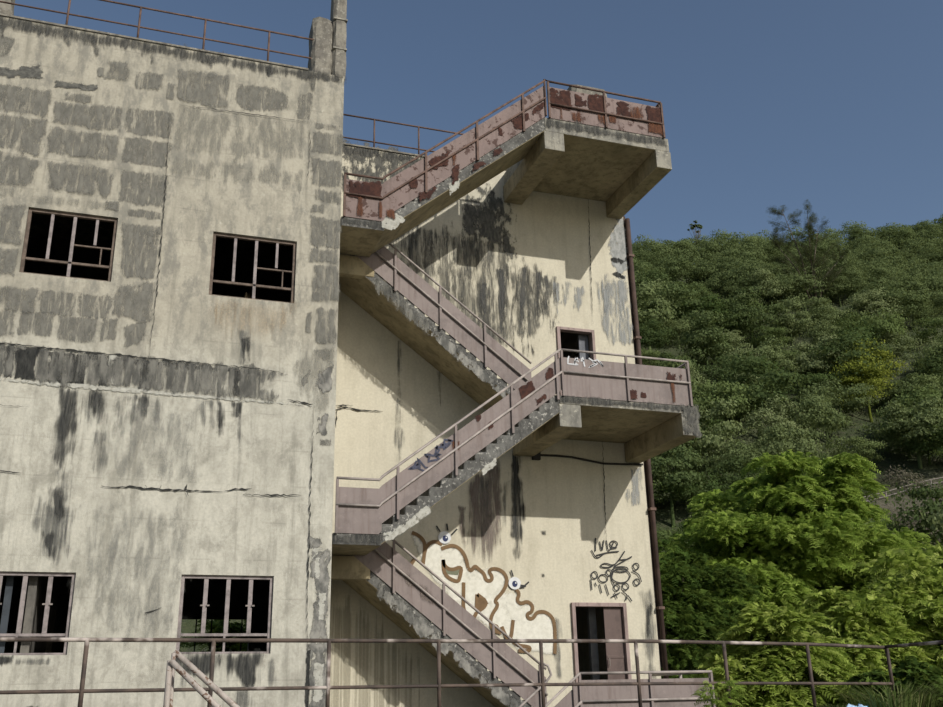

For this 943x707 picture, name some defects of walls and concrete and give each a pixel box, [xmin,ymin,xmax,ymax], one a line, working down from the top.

water stain [0,16,340,90]
crack [186,105,311,174]
corrosion [349,180,395,219]
corrosion [429,151,460,185]
corrosion [511,88,663,135]
crack [0,126,279,372]
water stain [386,183,585,354]
water stain [598,275,633,344]
corrosion [519,381,547,405]
water stain [34,386,104,557]
crack [103,399,383,649]
water stain [458,455,525,557]